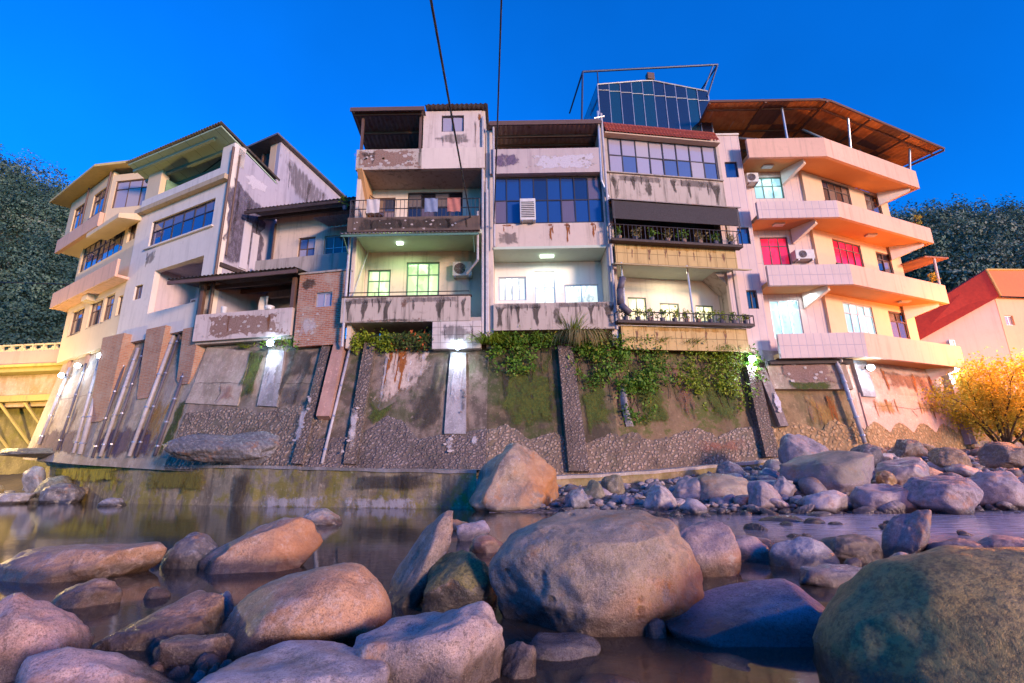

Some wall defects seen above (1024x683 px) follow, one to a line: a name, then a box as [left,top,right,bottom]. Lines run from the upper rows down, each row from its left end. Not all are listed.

peeling [356,149,421,168]
peeling [526,153,597,170]
water stain [611,176,652,195]
water stain [671,180,720,202]
peeling [201,311,319,340]
water stain [346,299,415,319]
water stain [436,299,466,317]
water stain [496,305,540,326]
water stain [554,304,614,323]
rust [384,350,407,390]